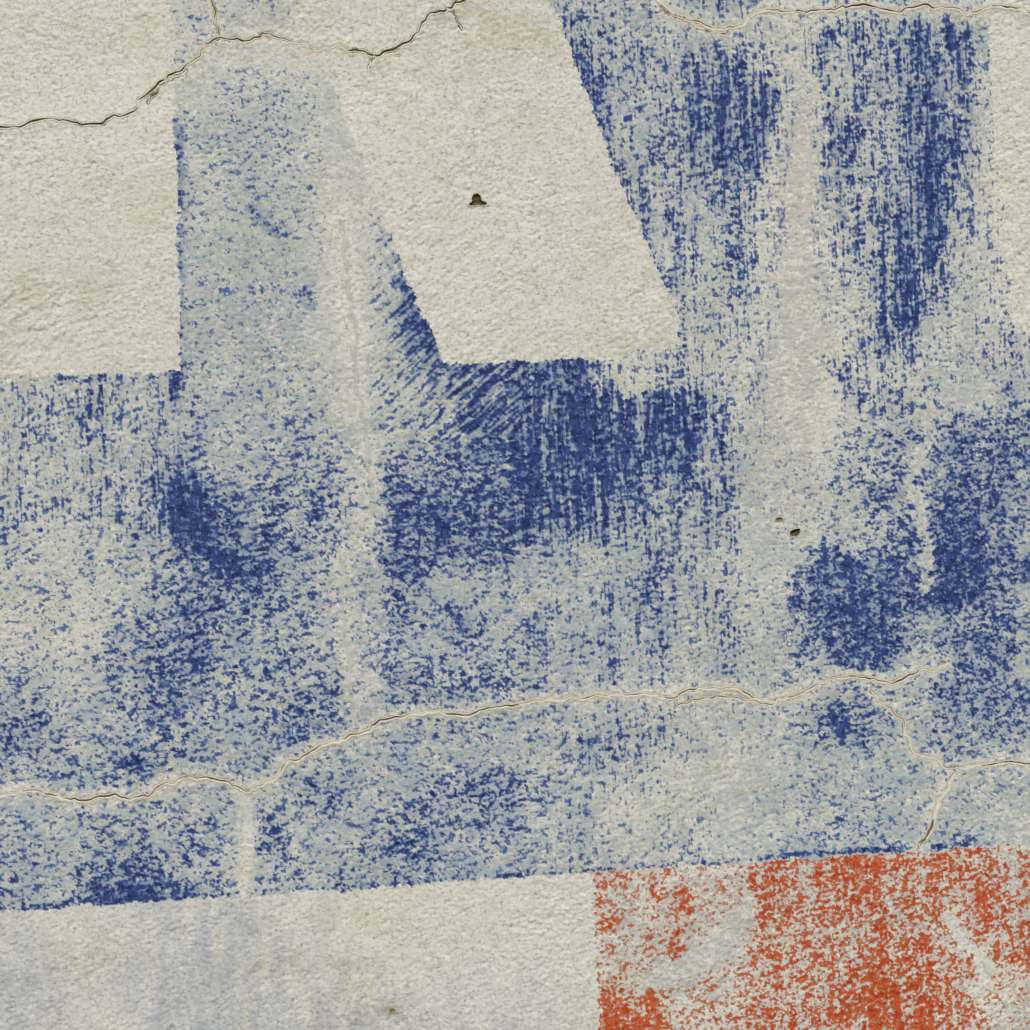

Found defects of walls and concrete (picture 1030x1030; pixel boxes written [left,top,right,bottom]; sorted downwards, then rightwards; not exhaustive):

crack [0,0,467,129]
crack [656,0,1030,35]
crack [339,221,354,320]
crack [0,563,1030,848]